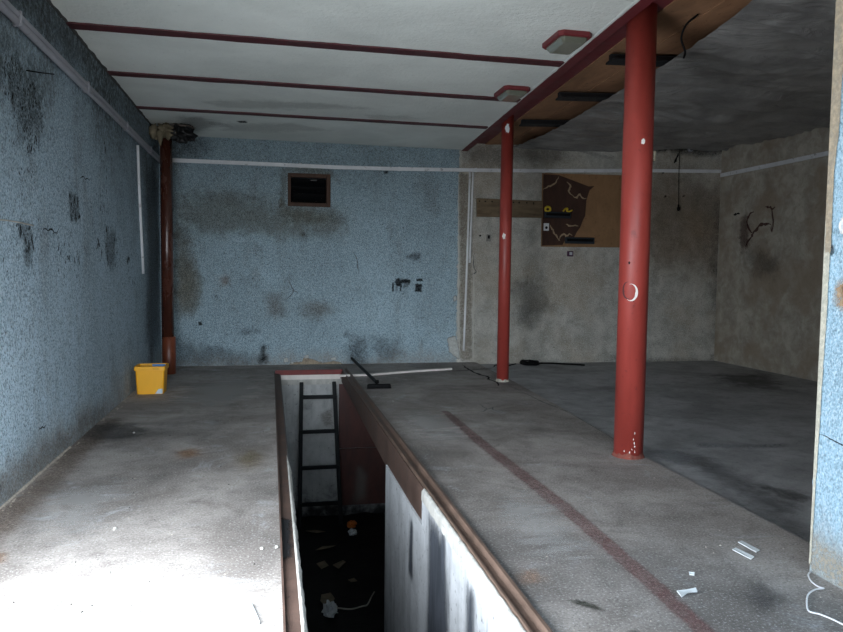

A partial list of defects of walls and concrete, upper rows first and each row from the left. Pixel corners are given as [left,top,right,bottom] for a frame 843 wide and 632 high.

rust [835,284,843,306]